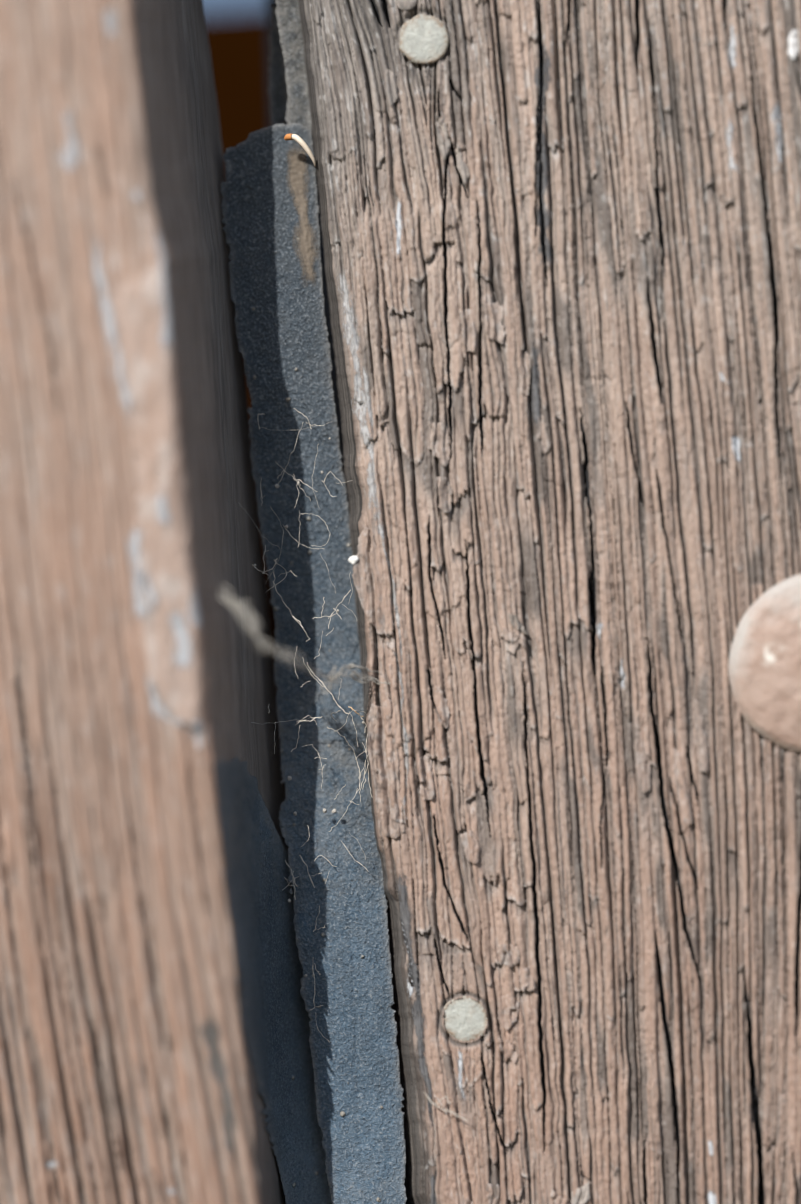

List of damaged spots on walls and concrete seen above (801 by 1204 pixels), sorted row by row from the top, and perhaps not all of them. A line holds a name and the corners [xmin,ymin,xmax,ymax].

crack [437,79,484,450]
peeling [428,421,452,513]
peeling [352,526,396,653]
peeling [366,697,405,840]
peeling [418,754,435,801]
peeling [433,686,450,728]
crack [427,520,490,825]
peeling [460,830,481,864]
crack [523,683,546,1136]
crack [580,415,608,865]
crack [643,647,699,1204]
crack [744,986,766,1204]